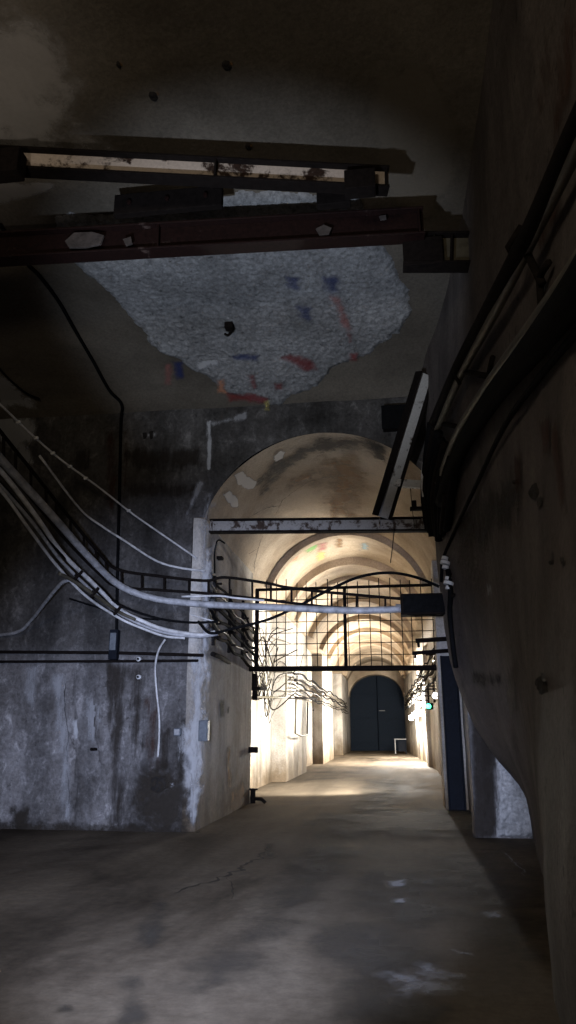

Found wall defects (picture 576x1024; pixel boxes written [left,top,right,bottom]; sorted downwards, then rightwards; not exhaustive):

leakage [201,525,211,601]
leakage [0,617,209,832]